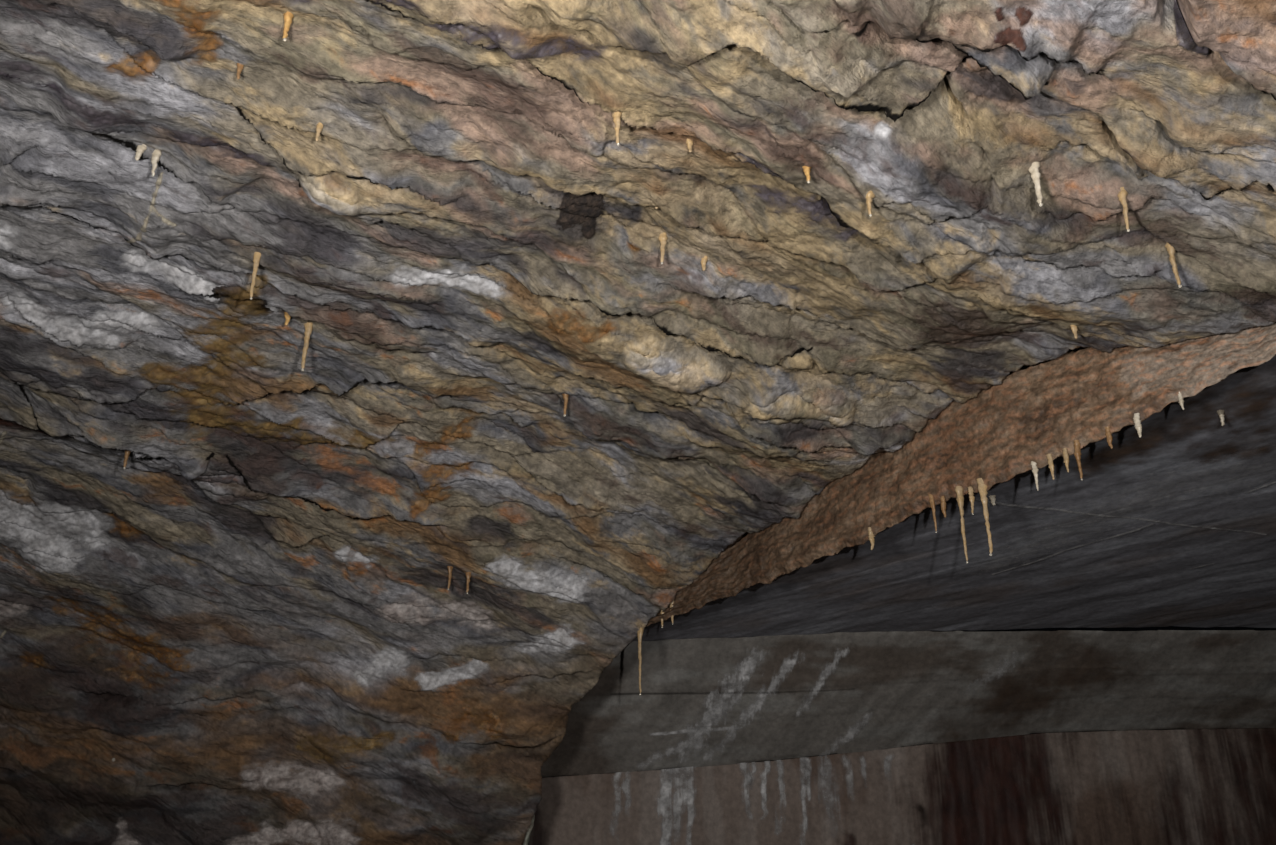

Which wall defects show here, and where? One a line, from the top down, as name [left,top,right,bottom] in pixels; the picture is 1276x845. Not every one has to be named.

water stain [797,649,848,715]
water stain [641,653,798,845]
water stain [800,715,869,845]